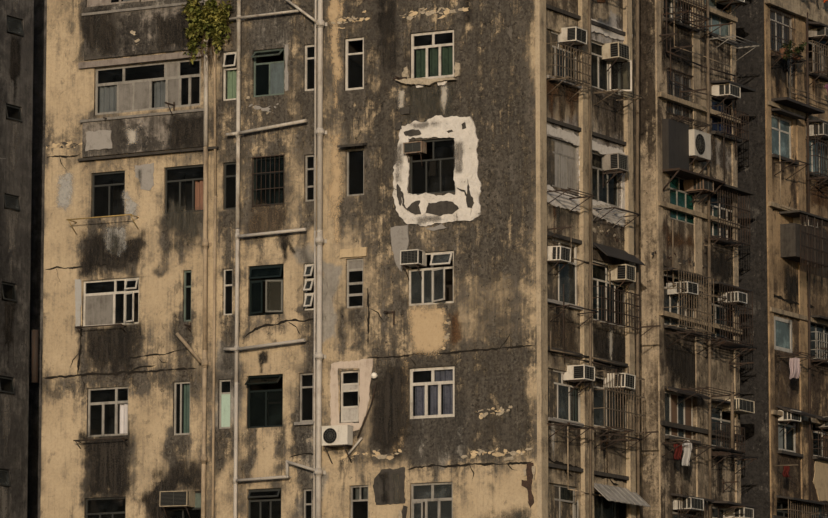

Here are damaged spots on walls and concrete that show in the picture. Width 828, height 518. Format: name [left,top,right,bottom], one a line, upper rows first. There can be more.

spalling [399,7,469,20]
flaking render [328,0,370,107]
peeling [419,197,428,216]
crack [45,266,82,280]
crack [243,318,317,338]
crack [367,288,535,366]
crack [43,325,196,395]
flaking render [477,406,513,419]
crack [408,458,627,485]